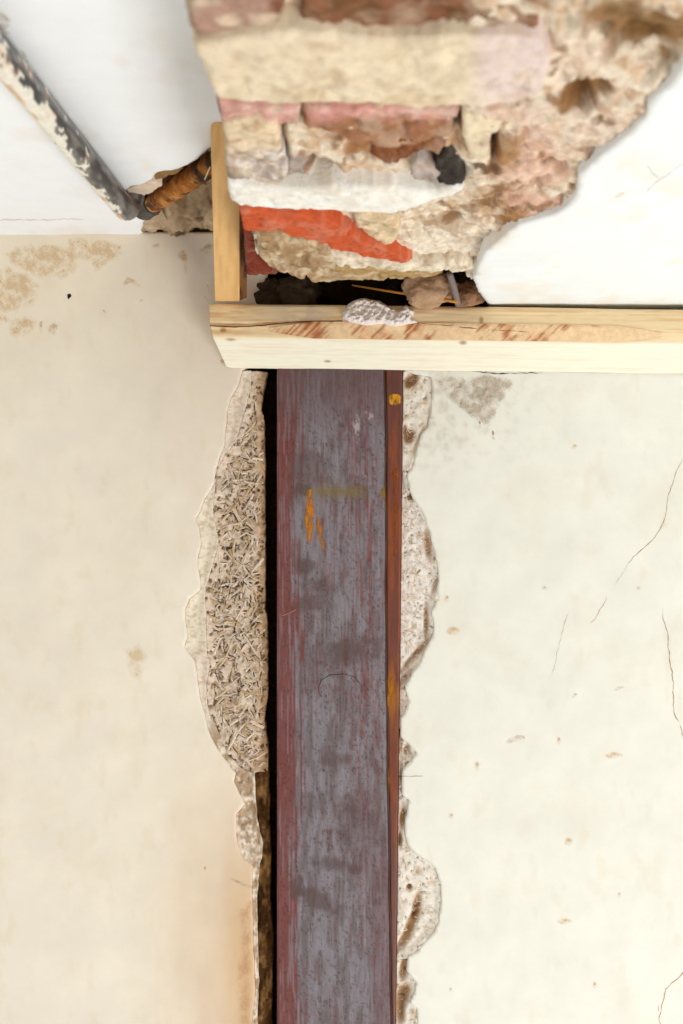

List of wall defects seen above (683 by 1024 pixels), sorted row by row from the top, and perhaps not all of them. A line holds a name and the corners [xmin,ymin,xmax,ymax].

flaking render [186,0,683,283]
corrosion [305,489,324,549]
crack [593,460,683,621]
flaking render [185,369,277,1024]
crack [663,619,683,736]